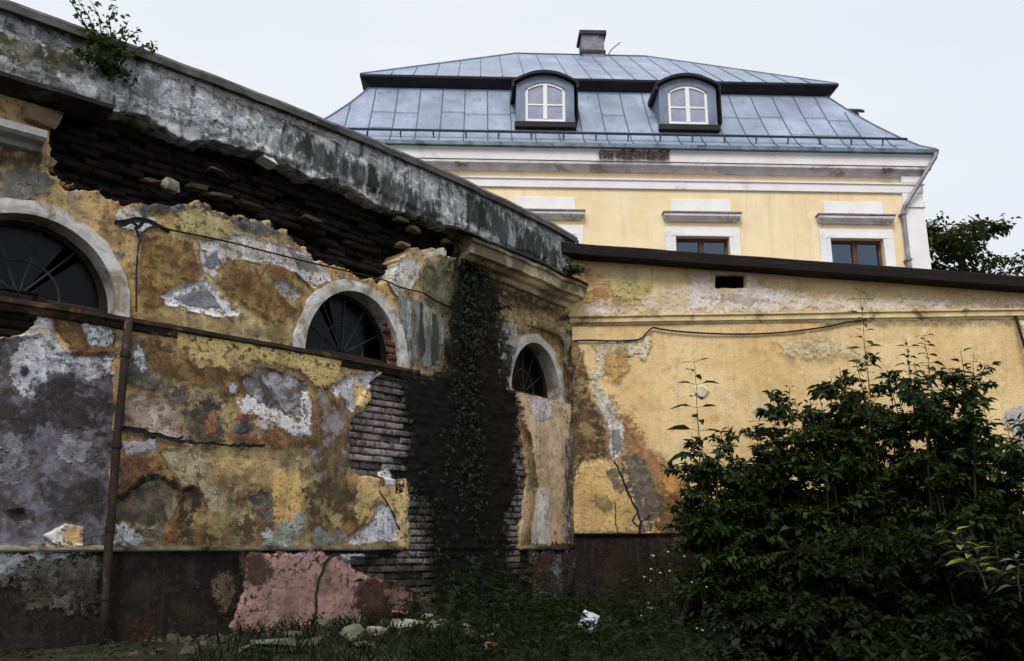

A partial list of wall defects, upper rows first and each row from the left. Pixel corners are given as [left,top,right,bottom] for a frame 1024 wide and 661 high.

spalling [0,114,456,317]
damp [285,131,441,224]
damp [466,193,560,268]
flaking render [0,312,224,546]
crack [113,426,265,448]
peeling [127,318,554,660]
damp [398,262,687,603]
crack [614,461,650,533]